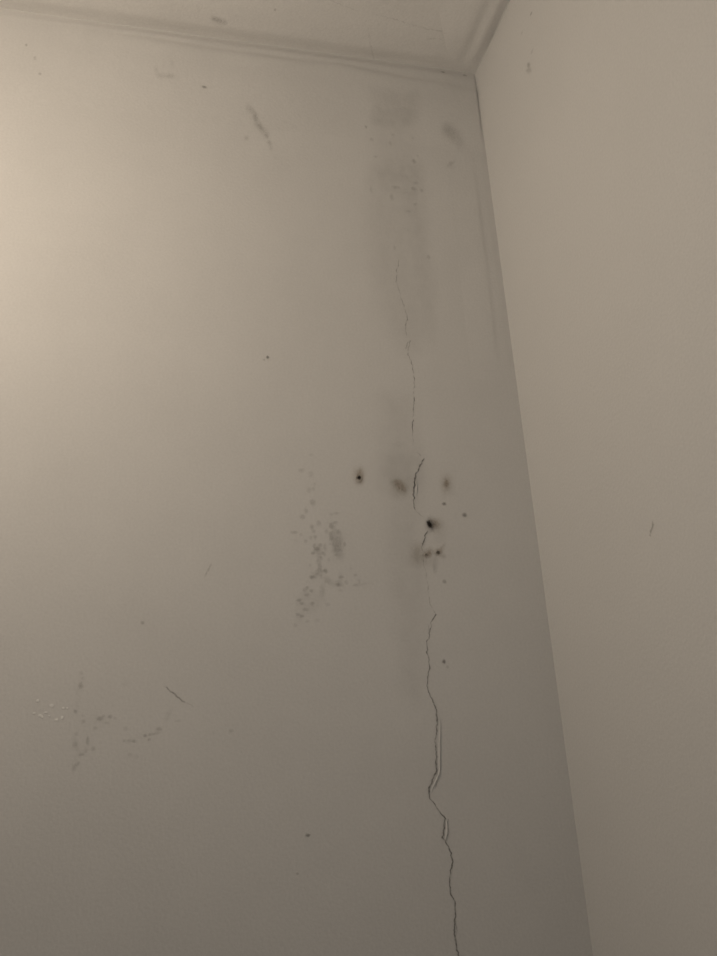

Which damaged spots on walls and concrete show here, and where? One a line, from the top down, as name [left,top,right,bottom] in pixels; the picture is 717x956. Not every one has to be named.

crack [426,615,462,956]